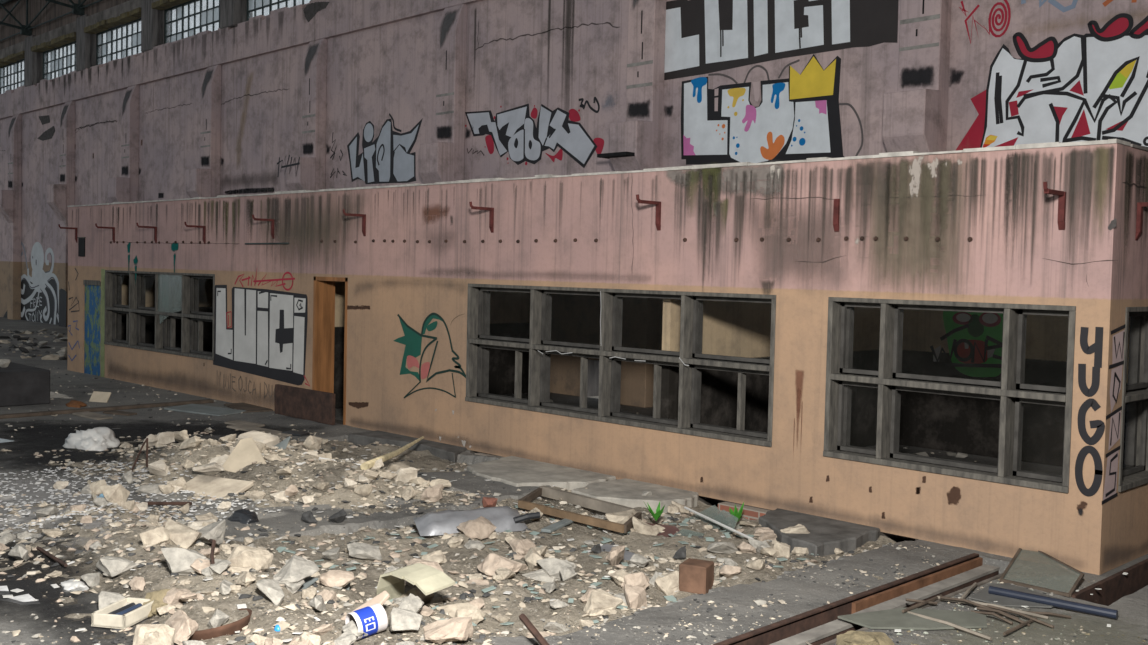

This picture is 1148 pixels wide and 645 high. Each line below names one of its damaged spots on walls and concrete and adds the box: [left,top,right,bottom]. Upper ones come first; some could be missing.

crack [477,21,619,49]
leakage [688,168,752,253]
leakage [770,165,783,212]
leakage [809,161,957,232]
leakage [974,154,1039,234]
leakage [1053,148,1113,223]
leakage [1125,153,1148,223]
rust [793,371,803,451]